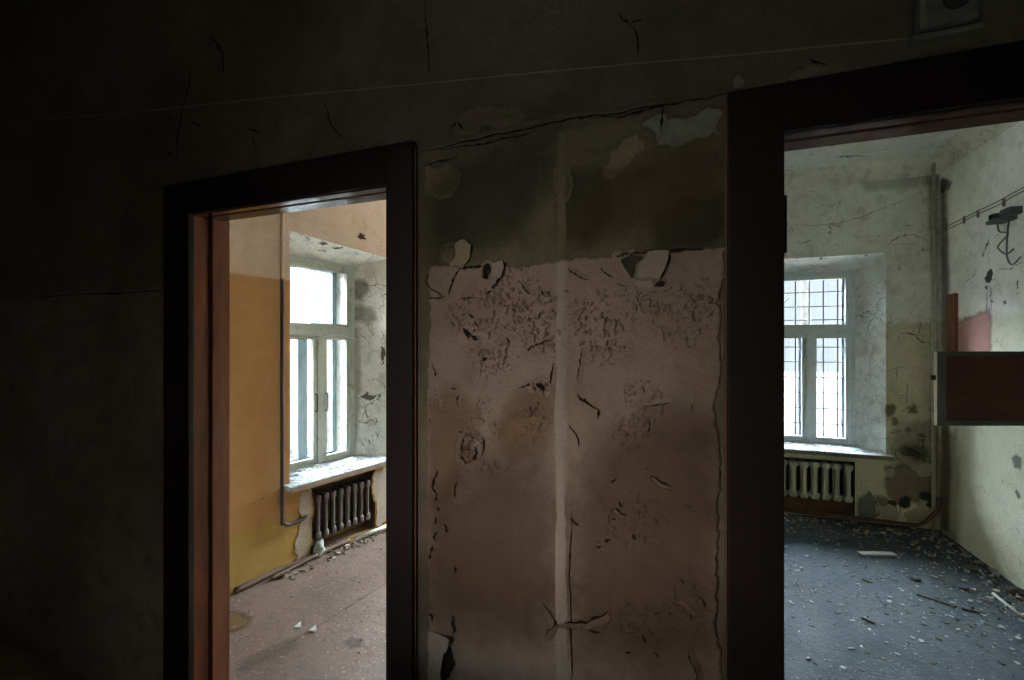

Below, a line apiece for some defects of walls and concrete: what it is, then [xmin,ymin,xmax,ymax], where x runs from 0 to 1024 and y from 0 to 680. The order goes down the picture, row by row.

crack [417,86,730,167]
peeling [438,239,505,288]
peeling [612,248,710,292]
damp [941,179,951,351]
crack [425,267,625,447]
peeling [290,455,386,561]
crack [359,411,379,446]
crack [429,468,458,560]
peeling [784,403,939,523]
damp [857,426,951,530]
crack [543,477,636,670]
peeling [427,613,460,680]